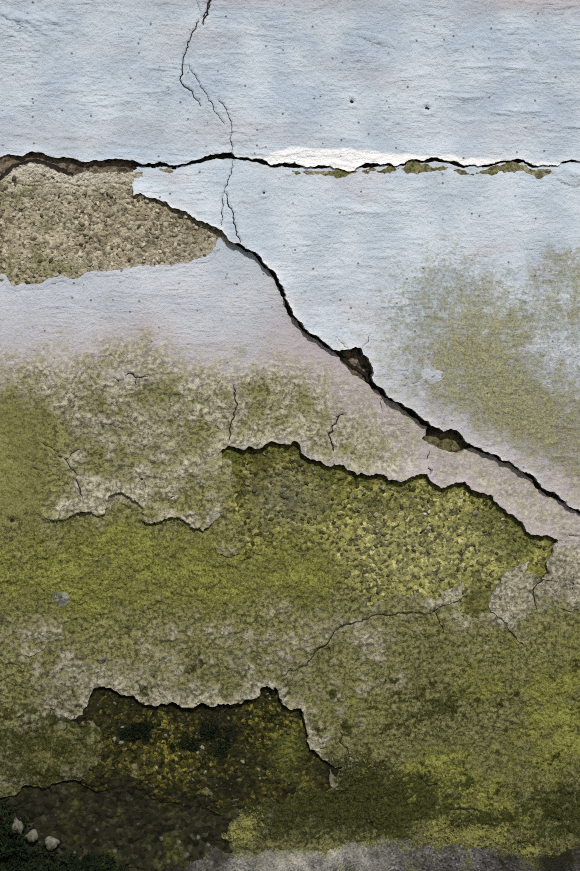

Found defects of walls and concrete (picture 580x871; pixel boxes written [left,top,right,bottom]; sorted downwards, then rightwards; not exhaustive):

flaking render [0,163,231,292]
crack [0,0,580,514]
flaking render [39,428,575,645]
crack [276,601,458,682]
flaking render [0,673,347,871]